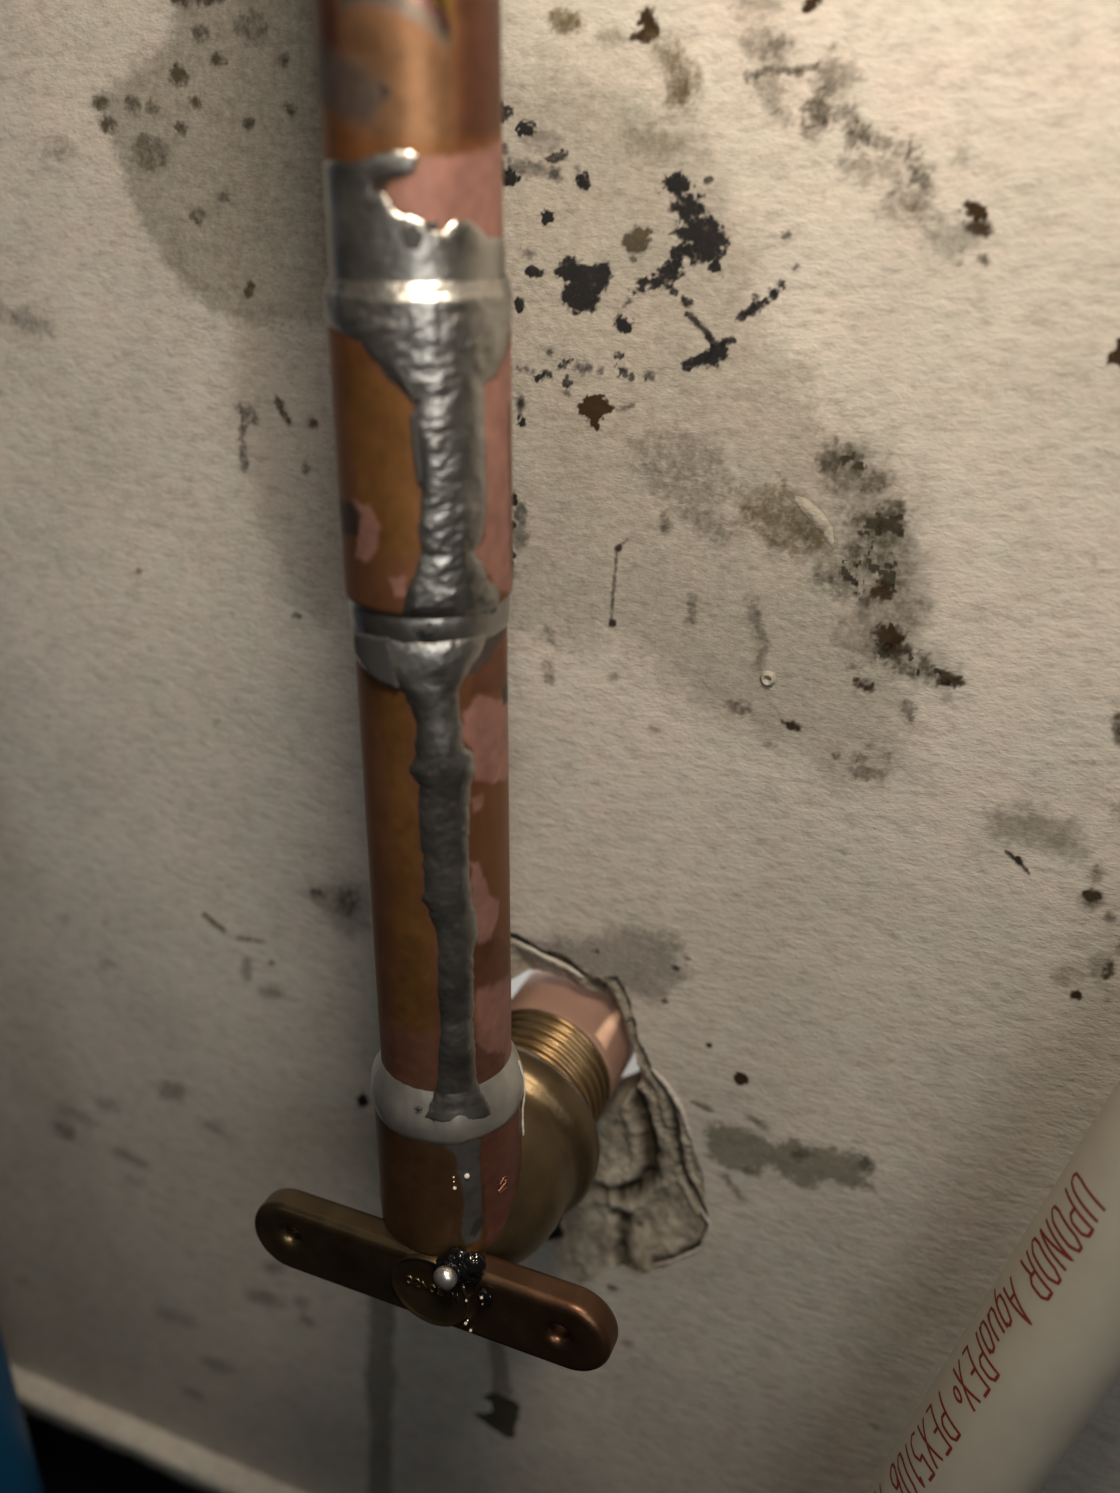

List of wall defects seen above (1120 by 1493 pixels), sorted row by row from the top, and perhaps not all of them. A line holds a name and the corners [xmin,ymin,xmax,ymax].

damp [551,10,580,32]
damp [802,0,821,12]
damp [630,7,698,101]
damp [95,97,116,133]
damp [171,64,198,106]
damp [753,64,886,147]
damp [964,200,991,236]
damp [860,577,893,606]
damp [872,624,964,688]
damp [853,677,874,691]
flaking render [510,931,712,1284]
damp [705,1126,873,1189]